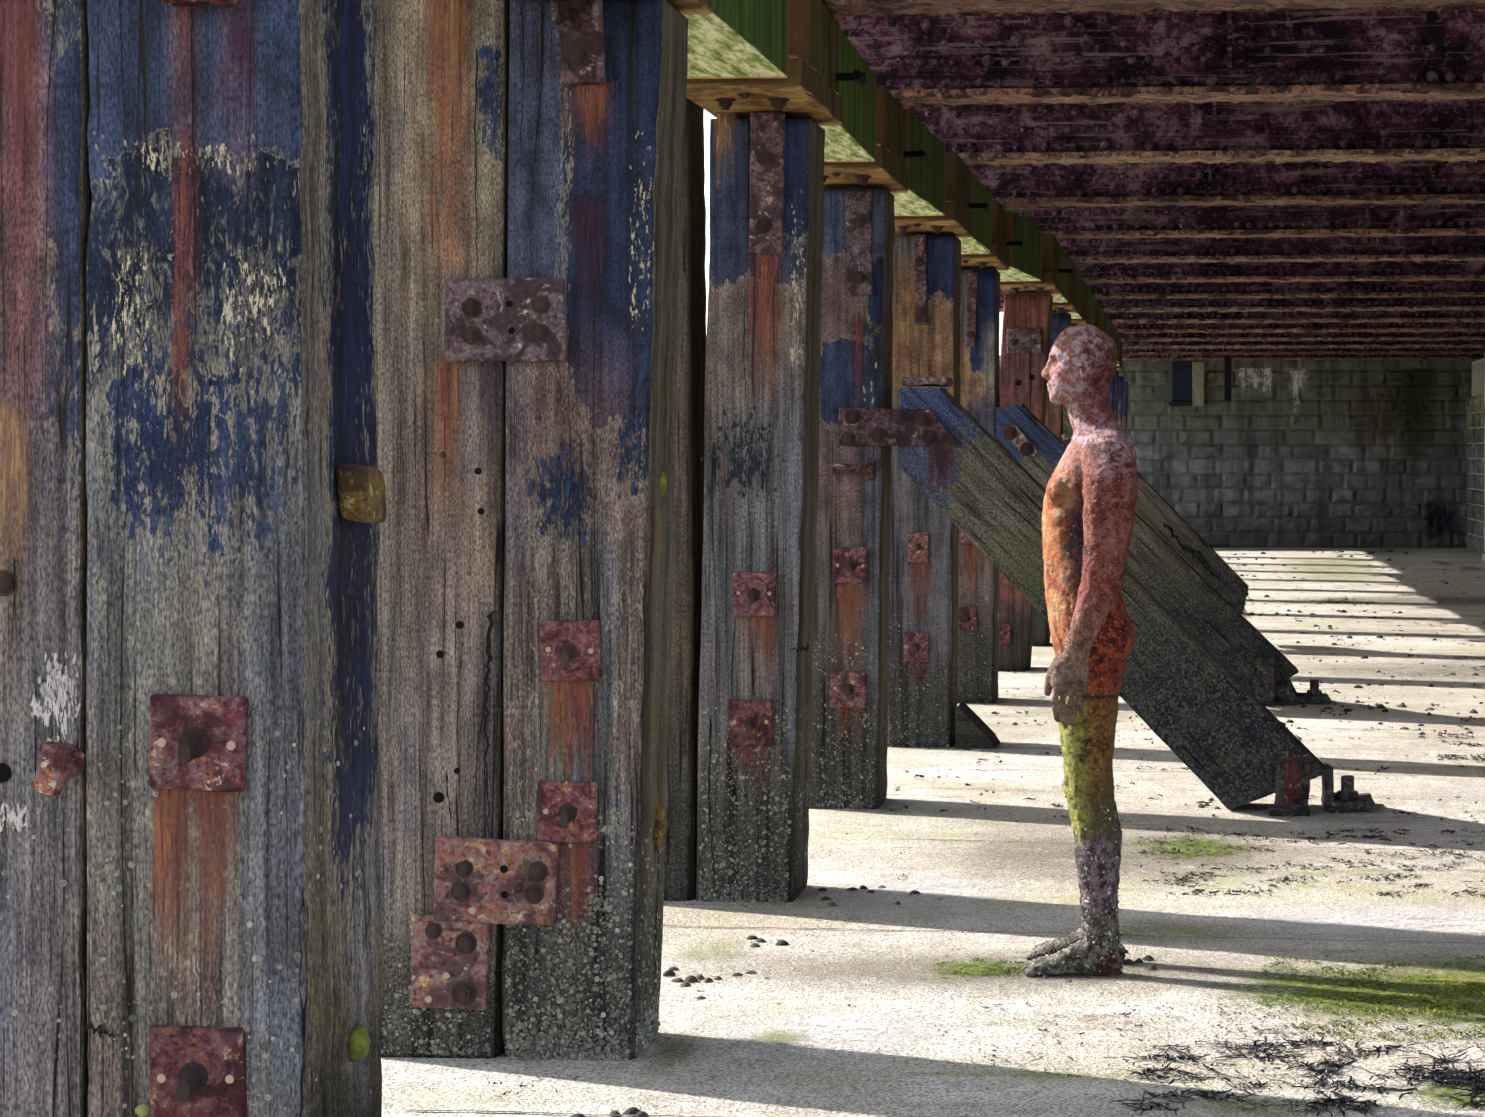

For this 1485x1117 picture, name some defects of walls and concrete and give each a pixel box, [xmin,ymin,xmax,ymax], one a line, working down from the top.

peeling [118,134,269,182]
peeling [221,229,286,377]
peeling [99,229,250,551]
peeling [617,373,651,499]
peeling [528,447,588,557]
peeling [30,647,81,744]
peeling [0,802,39,832]
corrosion [153,788,229,907]